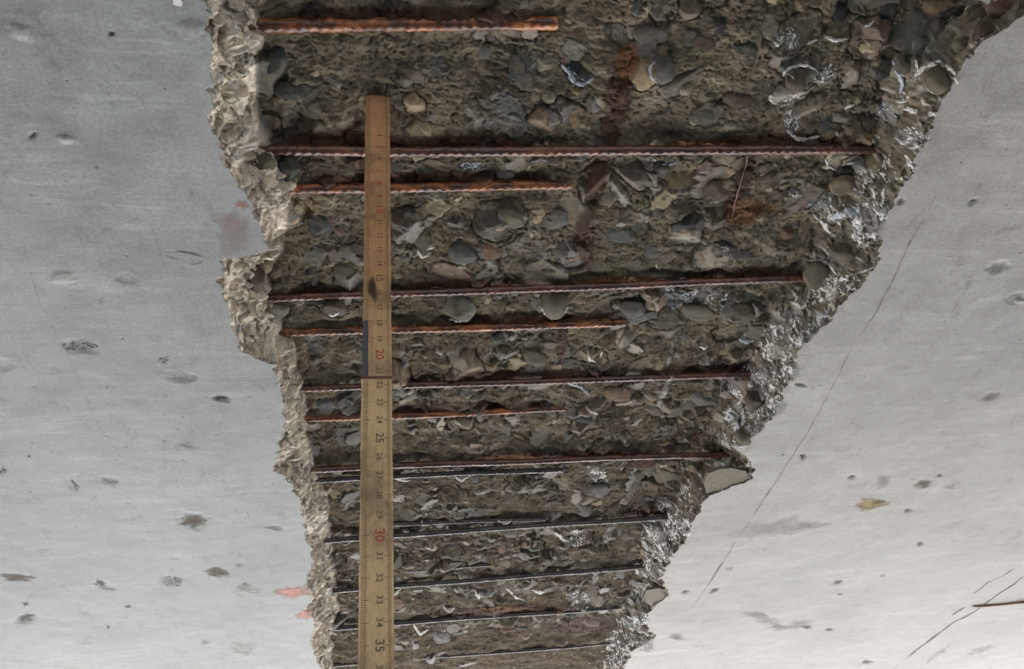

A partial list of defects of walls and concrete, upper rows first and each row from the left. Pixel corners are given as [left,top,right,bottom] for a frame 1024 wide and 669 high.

spalling [256,16,558,34]
rust [293,7,540,26]
rust [288,117,365,187]
spalling [390,144,877,158]
rust [390,171,550,186]
spalling [390,180,573,194]
spalling [391,272,805,298]
rust [690,268,798,279]
crack [864,235,914,330]
rust [406,313,614,384]
spalling [393,451,731,469]
crack [910,570,1020,656]